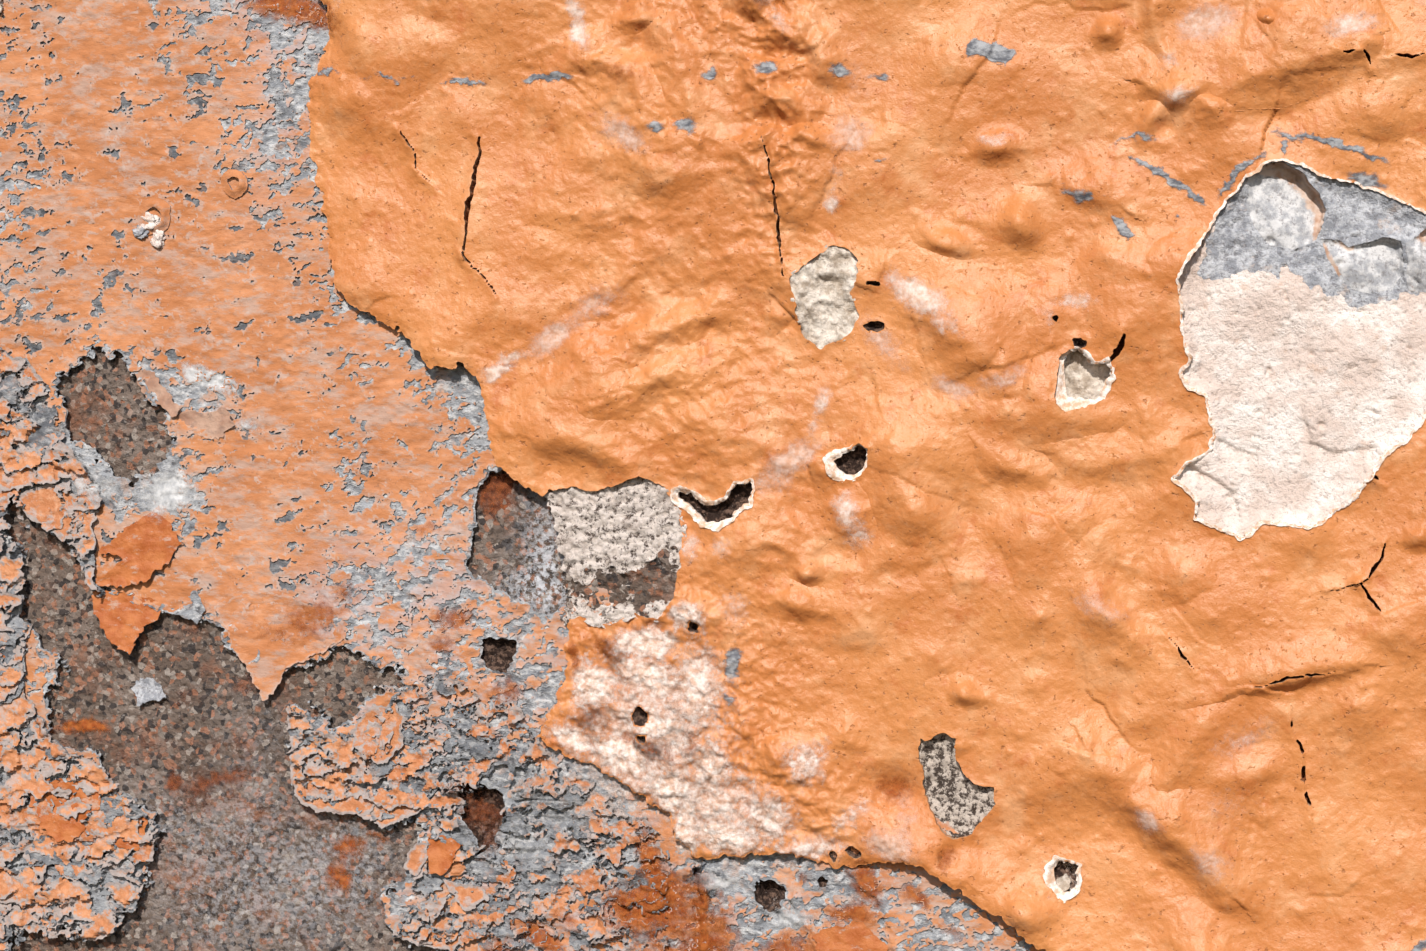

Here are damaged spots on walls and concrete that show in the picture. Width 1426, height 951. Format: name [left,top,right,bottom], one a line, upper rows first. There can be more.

crack [466,137,482,232]
crack [764,146,783,273]
peeling [790,245,859,349]
peeling [1171,158,1426,541]
crack [1338,543,1386,610]
spalling [0,346,687,951]
peeling [919,733,995,838]
peeling [812,921,888,951]